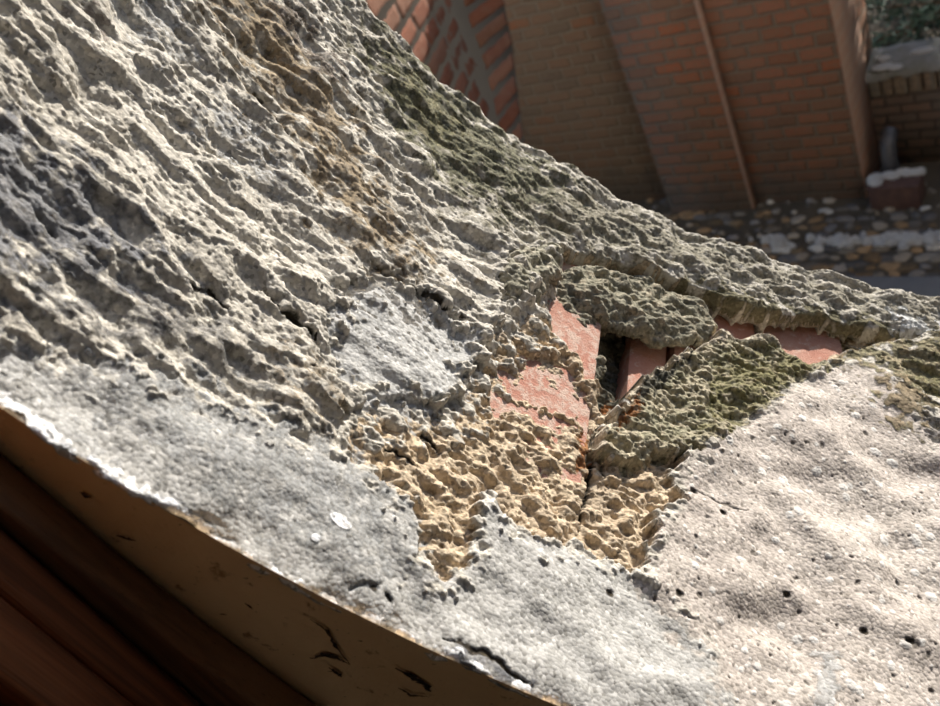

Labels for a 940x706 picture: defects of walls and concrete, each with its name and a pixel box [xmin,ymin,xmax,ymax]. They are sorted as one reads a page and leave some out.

crack [190,283,228,310]
spalling [562,249,689,296]
crack [578,427,605,529]
spalling [318,276,895,582]